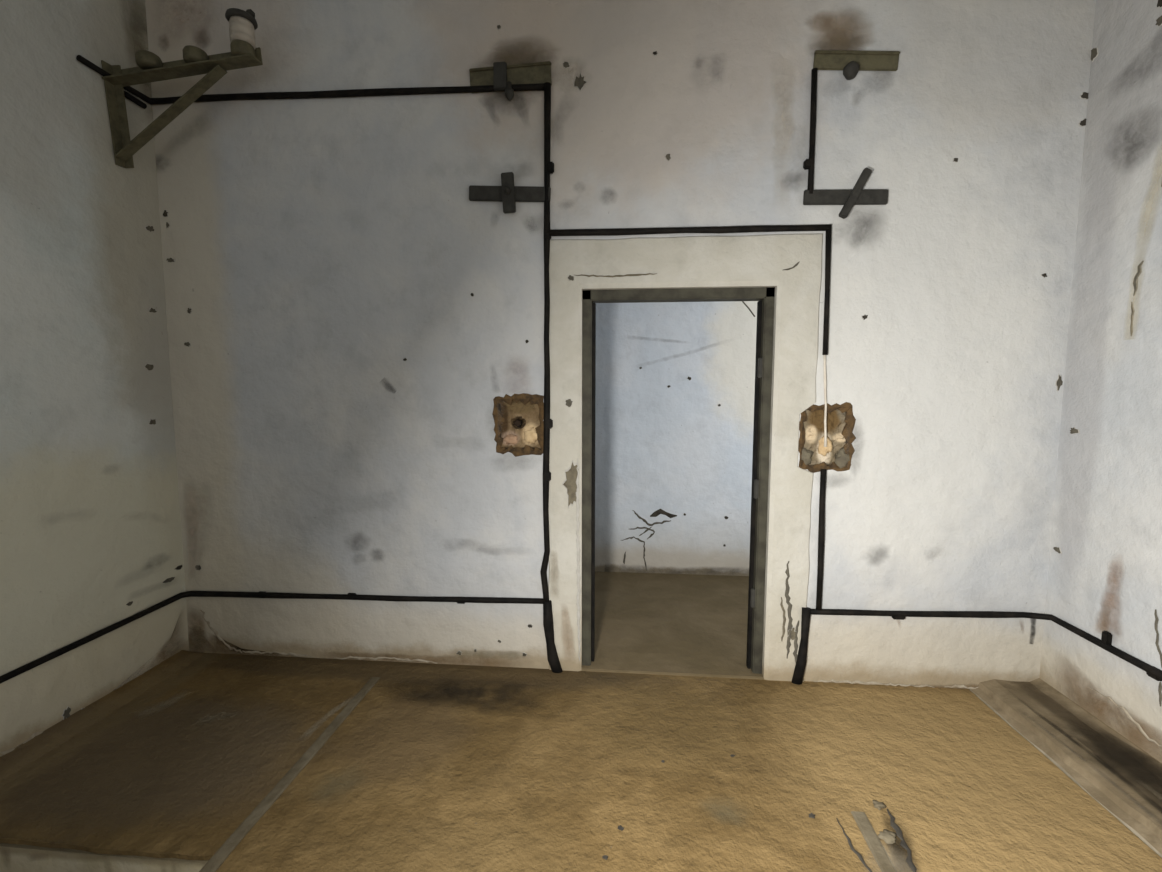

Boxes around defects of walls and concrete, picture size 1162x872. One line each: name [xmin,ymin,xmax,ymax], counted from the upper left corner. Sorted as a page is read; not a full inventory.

damp [1037,713,1162,812]